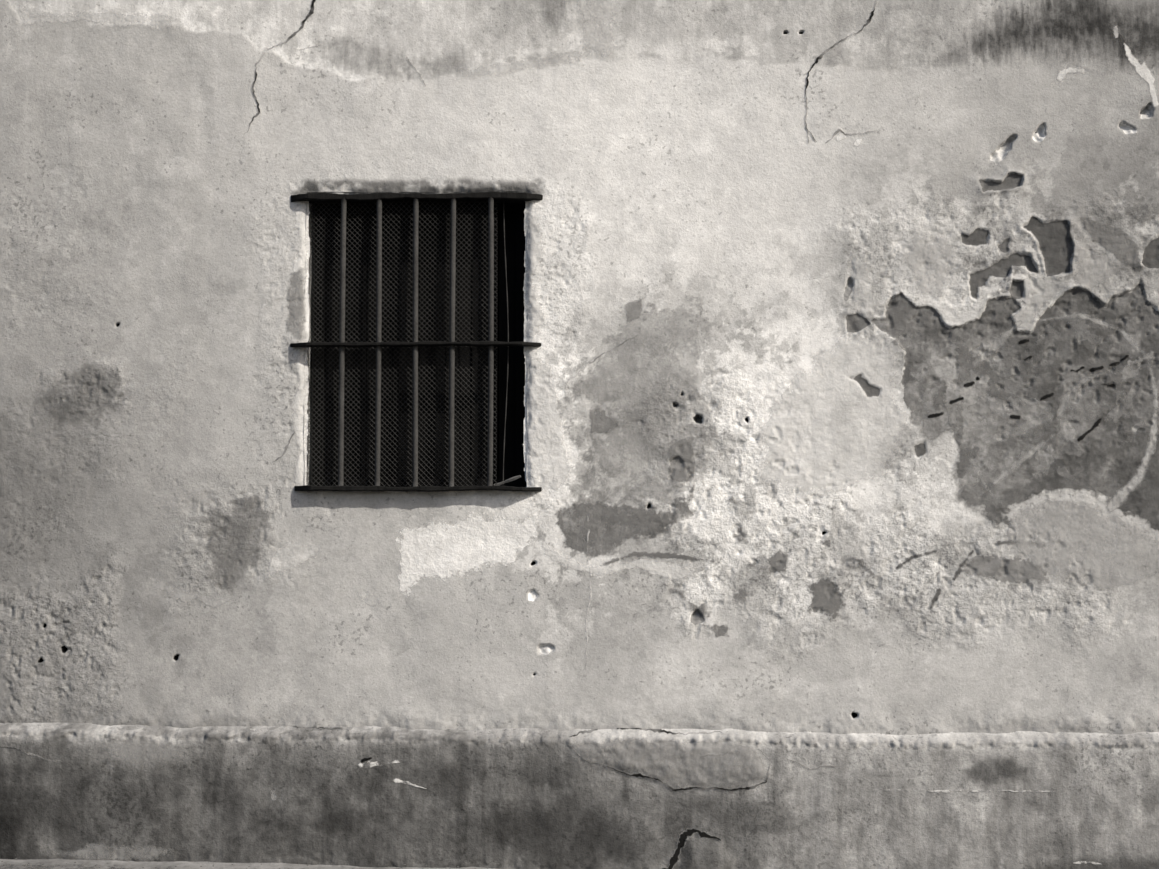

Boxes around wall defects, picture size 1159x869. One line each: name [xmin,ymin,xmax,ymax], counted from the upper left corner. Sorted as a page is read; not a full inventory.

water stain [973,0,1159,61]
crack [244,0,316,141]
crack [805,4,876,146]
flaking render [990,136,1016,166]
peeling [979,173,1022,192]
peeling [846,217,1159,530]
water stain [205,497,267,583]
peeling [953,540,1049,584]
peeling [675,591,728,637]
crack [570,728,722,737]
water stain [971,760,1020,781]
crack [662,828,721,869]